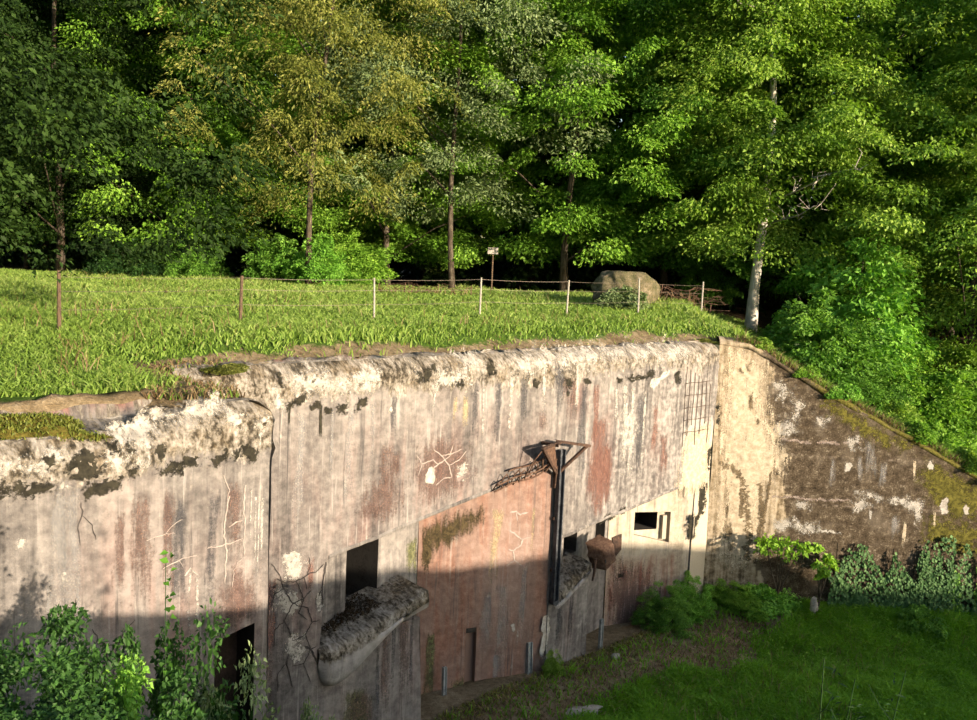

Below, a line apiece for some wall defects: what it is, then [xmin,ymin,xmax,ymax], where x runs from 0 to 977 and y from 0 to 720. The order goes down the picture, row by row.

damp [319,407,334,460]
crack [417,447,466,485]
damp [453,377,527,441]
damp [542,364,564,410]
damp [575,367,588,469]
corrosion [586,386,612,515]
damp [614,385,647,476]
damp [250,490,264,562]
spalling [940,497,949,514]
crack [271,558,327,691]